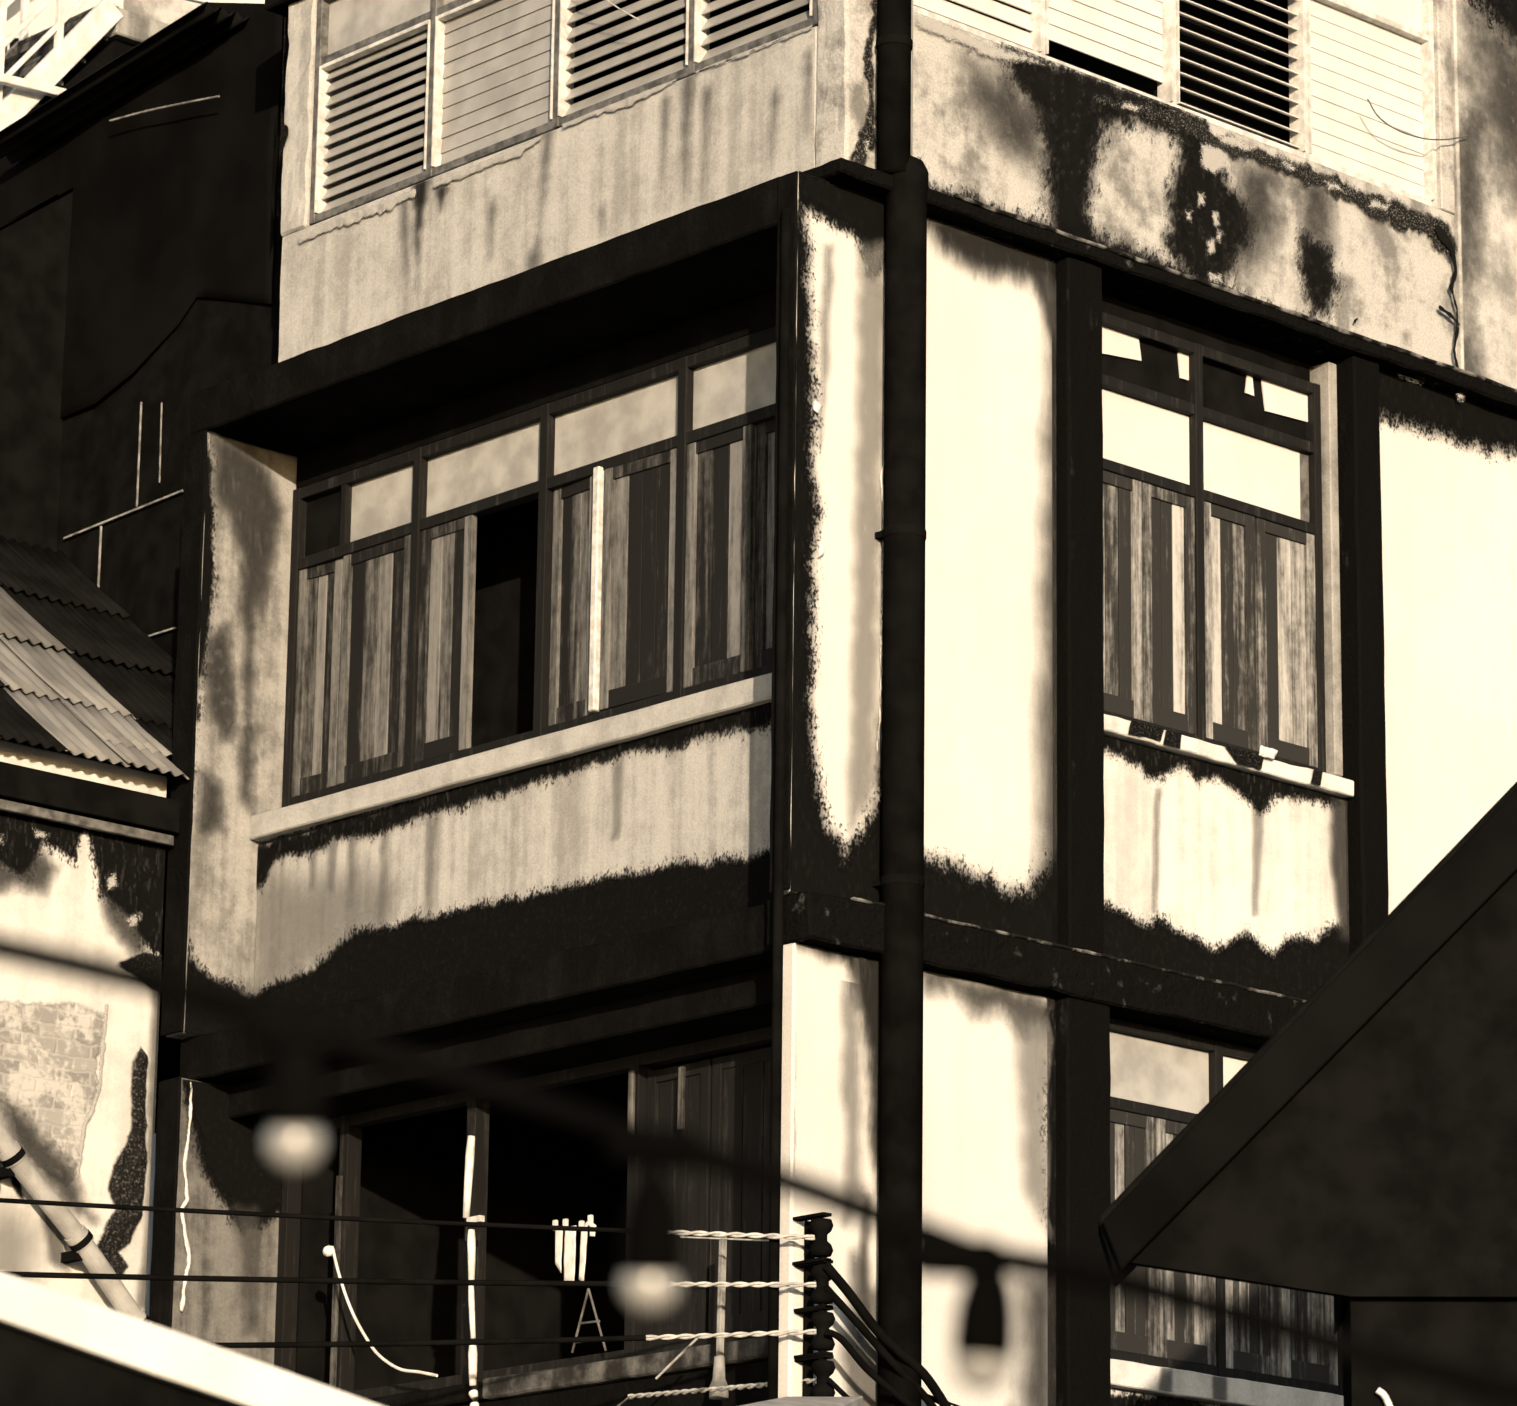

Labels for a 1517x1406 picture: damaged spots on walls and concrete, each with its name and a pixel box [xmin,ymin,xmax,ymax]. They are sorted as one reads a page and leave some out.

leakage [404,178,445,247]
leakage [683,75,708,132]
leakage [928,42,1345,323]
leakage [1459,0,1517,279]
leakage [196,432,280,803]
leakage [791,171,886,902]
leakage [1379,370,1517,463]
leakage [1464,338,1475,373]
leakage [0,796,166,956]
leakage [187,702,773,1013]
leakage [1104,735,1349,1000]